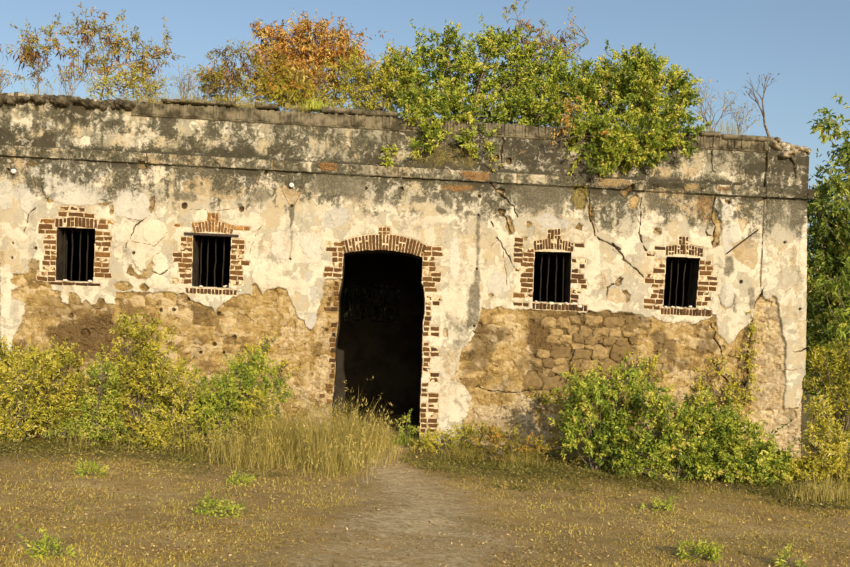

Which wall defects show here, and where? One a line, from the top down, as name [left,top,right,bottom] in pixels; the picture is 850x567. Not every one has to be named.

peeling [113,251,168,292]
crack [125,209,168,275]
crack [489,138,527,285]
leakage [510,163,599,218]
crack [588,184,647,277]
crack [705,150,717,244]
crack [710,152,768,388]
peeling [305,311,317,330]